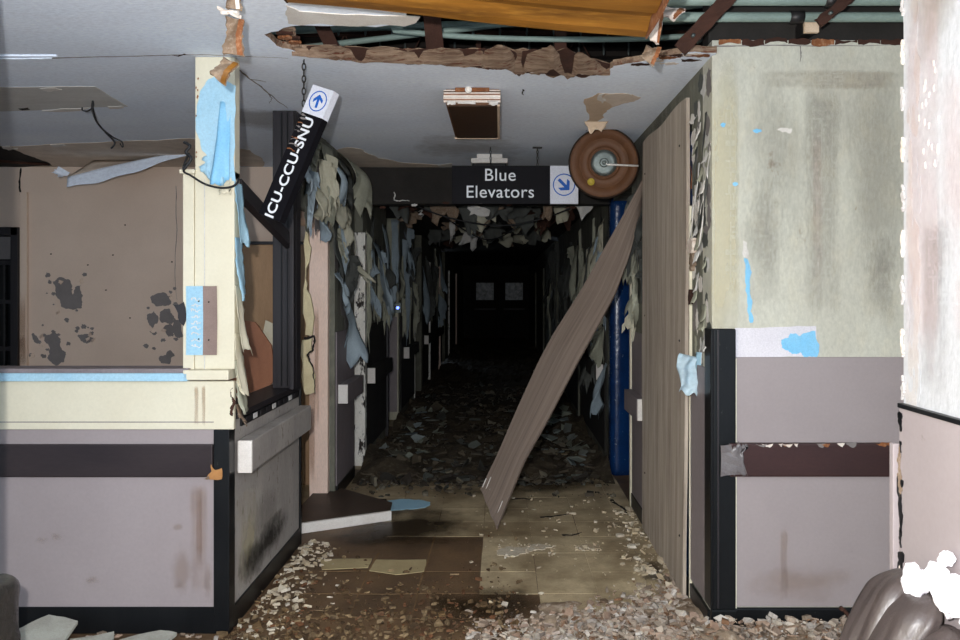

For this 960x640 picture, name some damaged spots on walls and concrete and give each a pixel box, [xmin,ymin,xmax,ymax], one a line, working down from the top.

peeling [276,5,420,48]
peeling [583,93,641,134]
peeling [324,140,453,167]
peeling [0,77,264,414]
peeling [375,218,386,296]
spalling [301,192,320,394]
damp [246,519,282,570]